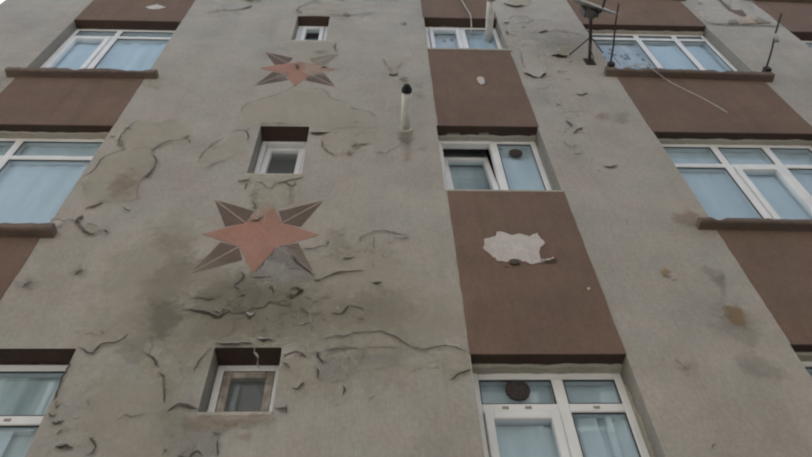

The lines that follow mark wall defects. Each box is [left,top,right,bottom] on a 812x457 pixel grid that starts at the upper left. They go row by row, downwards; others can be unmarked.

flaking render [504,0,531,35]
flaking render [311,59,431,159]
flaking render [49,200,108,237]
flaking render [481,230,558,268]
flaking render [182,307,230,319]
flaking render [141,340,197,413]
flaking render [49,359,72,434]